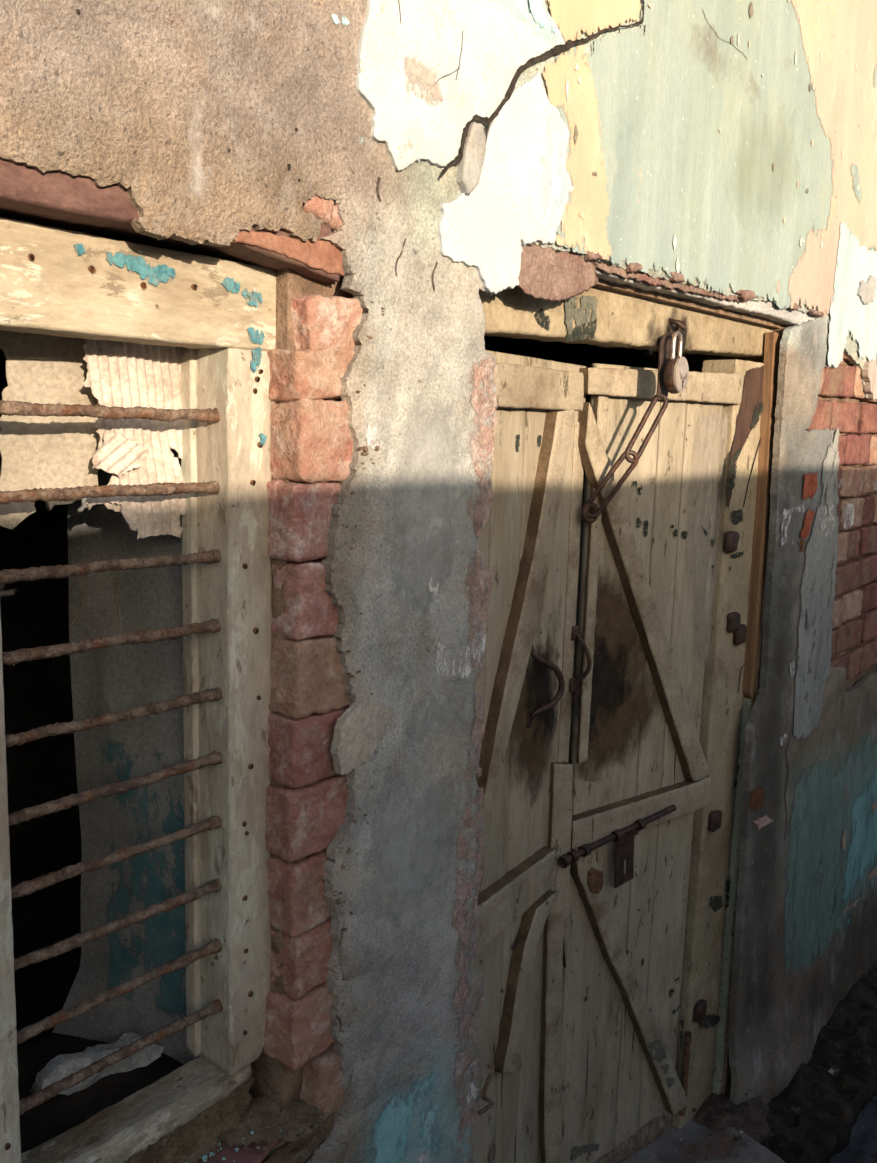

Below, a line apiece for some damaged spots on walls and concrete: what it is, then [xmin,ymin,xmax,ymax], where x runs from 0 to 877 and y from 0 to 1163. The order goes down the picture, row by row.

crack [440,0,644,178]
peeling [231,195,345,277]
peeling [355,0,877,681]
spalling [371,356,498,1163]
flaking render [753,815,773,830]
peeling [842,769,877,925]